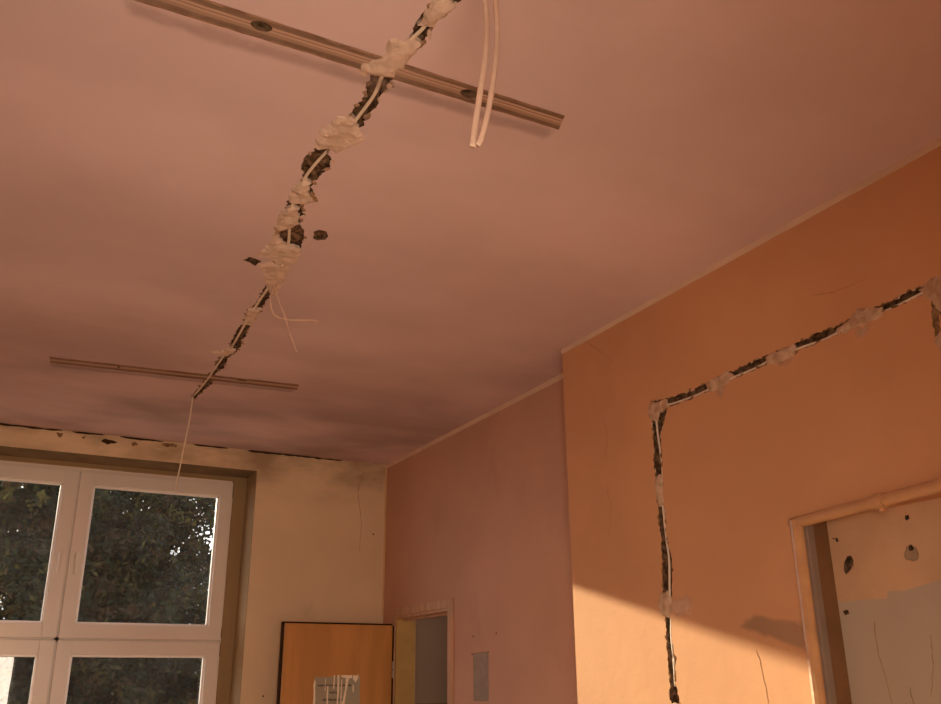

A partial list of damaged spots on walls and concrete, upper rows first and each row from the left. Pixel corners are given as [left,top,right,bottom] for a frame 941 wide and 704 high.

spalling [931,301,941,337]